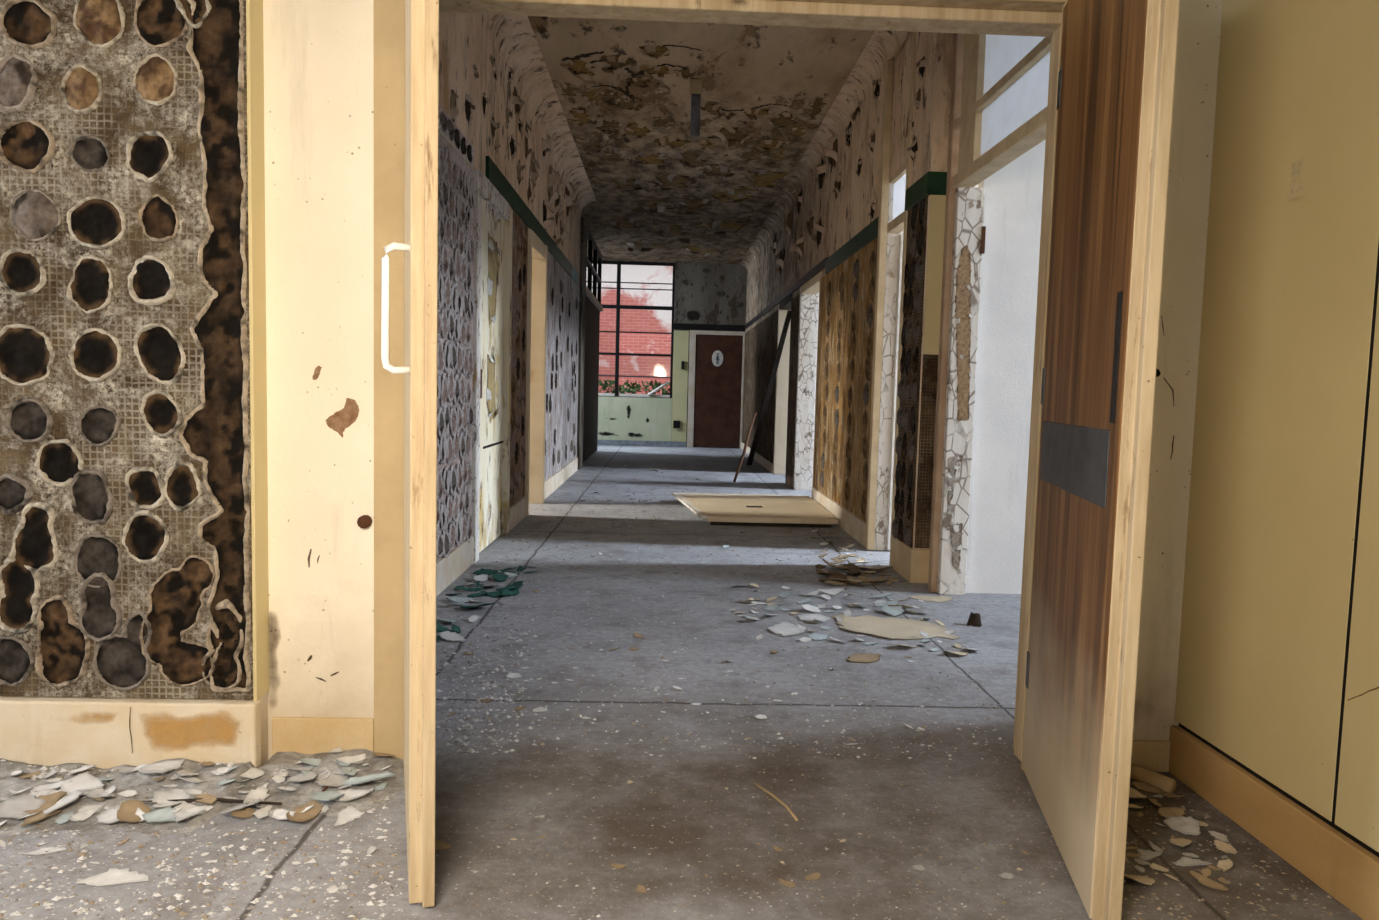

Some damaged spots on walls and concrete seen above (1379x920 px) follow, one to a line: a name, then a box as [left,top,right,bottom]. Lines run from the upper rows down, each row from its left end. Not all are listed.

peeling [558,45,881,273]
peeling [325,398,359,438]